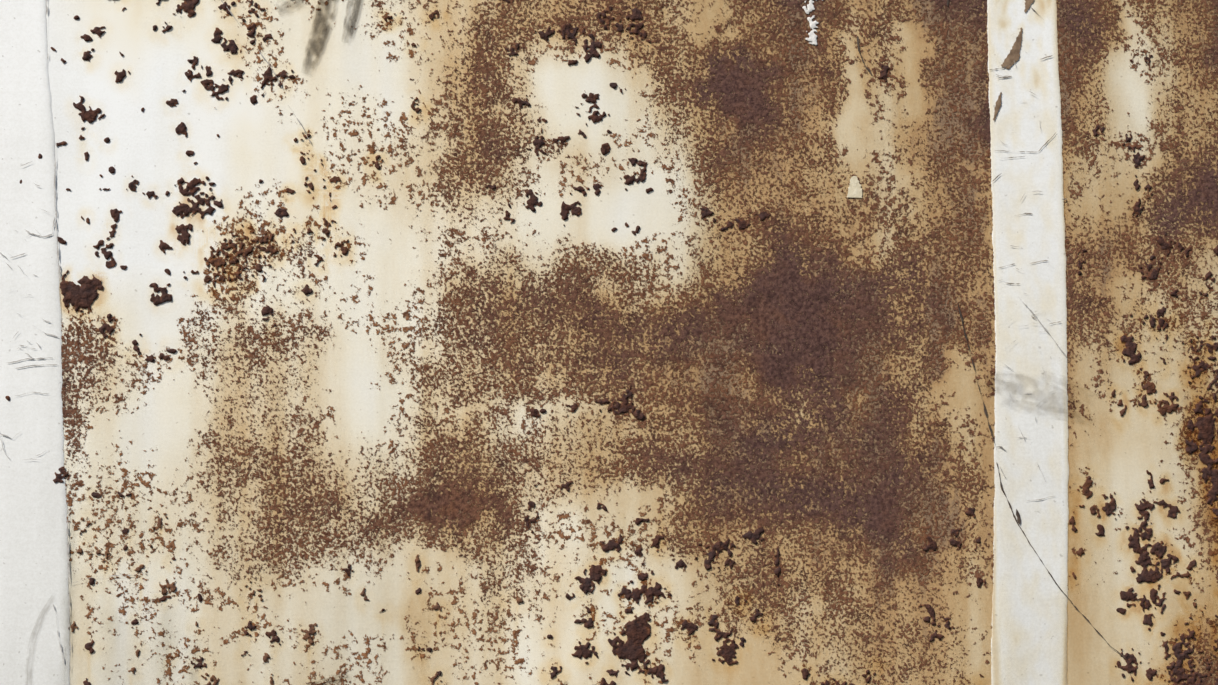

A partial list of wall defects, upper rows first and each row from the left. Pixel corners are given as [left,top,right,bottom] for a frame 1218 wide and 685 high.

rust [53,0,996,685]